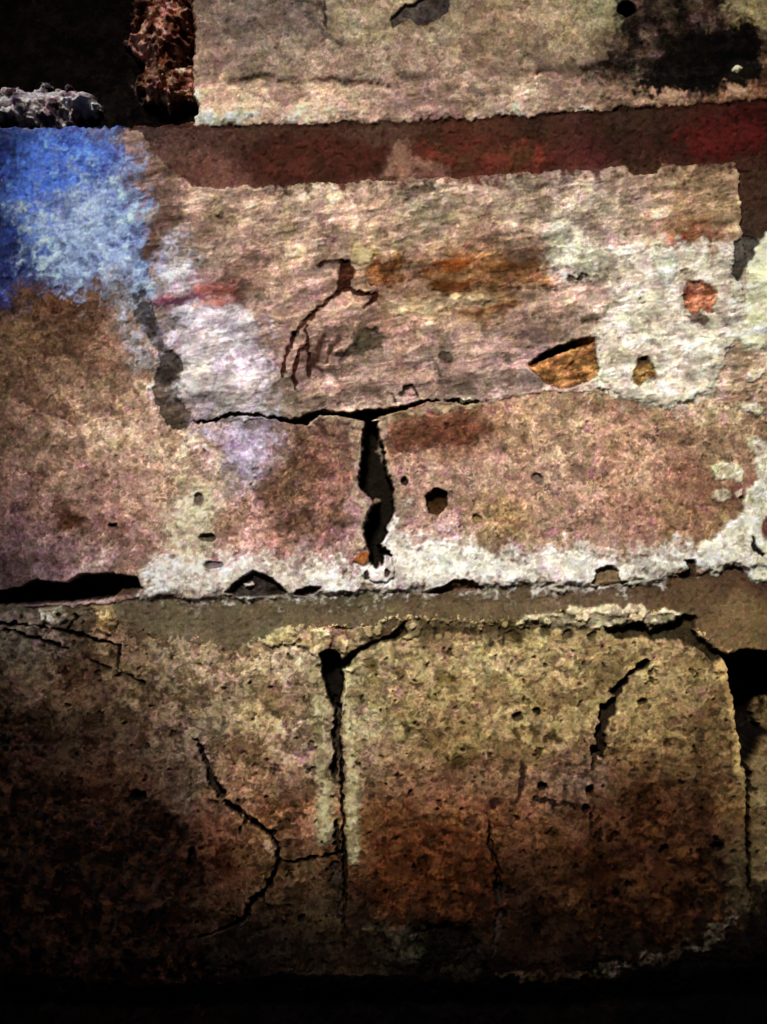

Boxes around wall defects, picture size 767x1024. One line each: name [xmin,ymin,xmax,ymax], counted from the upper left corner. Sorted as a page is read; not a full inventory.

spalling [390,0,450,28]
crack [281,259,379,390]
corrosion [364,245,556,320]
spalling [529,337,599,388]
spalling [631,356,658,387]
spalling [683,280,718,324]
crack [195,397,480,569]
water stain [136,402,708,606]
water stain [748,436,767,478]
crack [193,623,408,939]
crack [487,659,650,956]
crack [718,649,767,907]